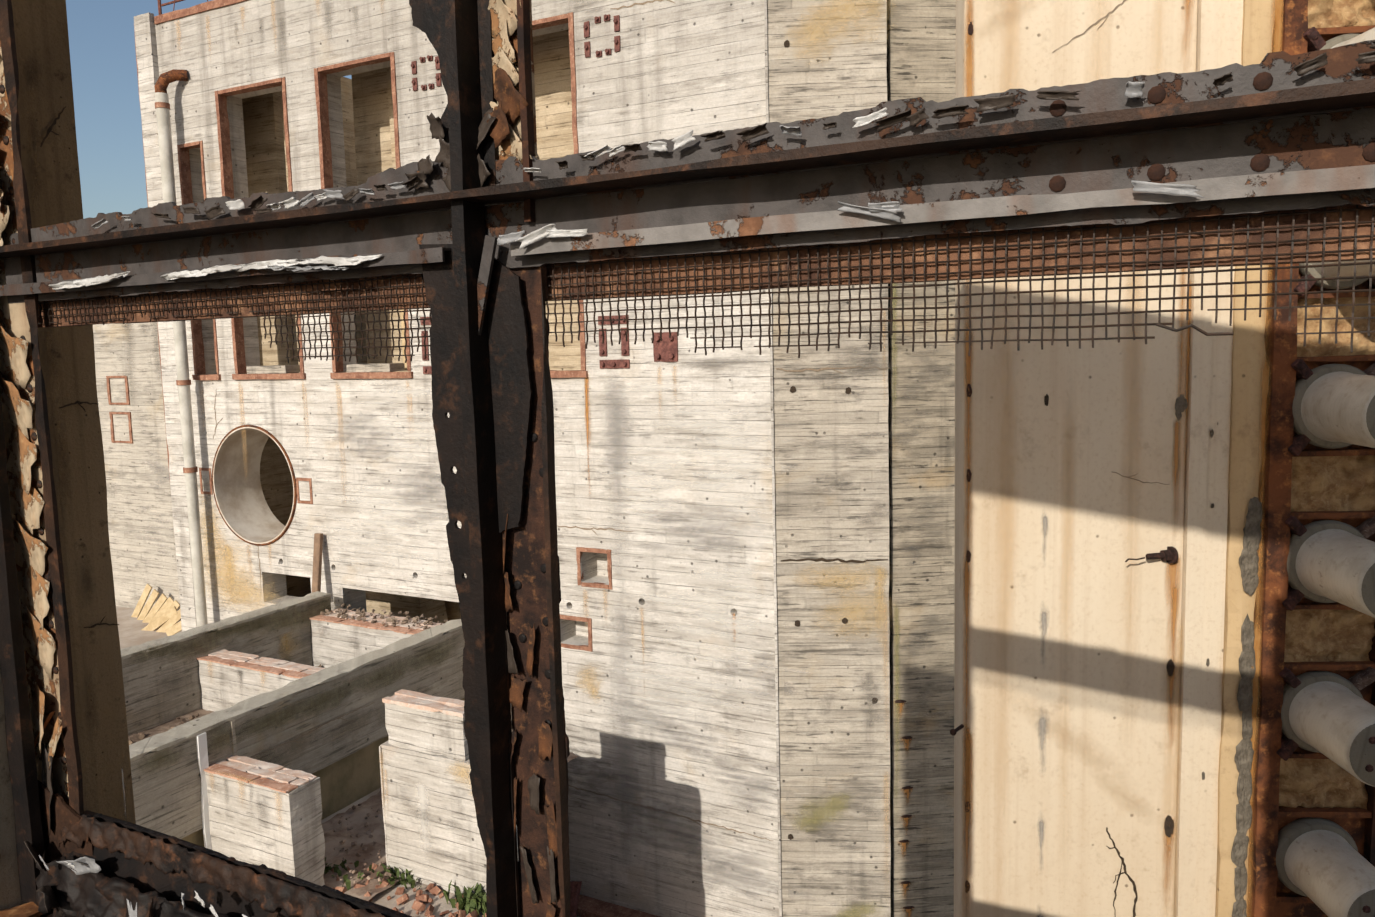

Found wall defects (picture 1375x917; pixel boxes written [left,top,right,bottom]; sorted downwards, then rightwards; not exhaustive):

crack [1052,0,1126,53]
rust [1274,0,1283,52]
peeling [0,178,10,246]
rust [1260,361,1269,502]
crack [781,556,888,564]
rust [964,325,972,893]
rust [1250,626,1261,803]
crack [1106,827,1138,917]